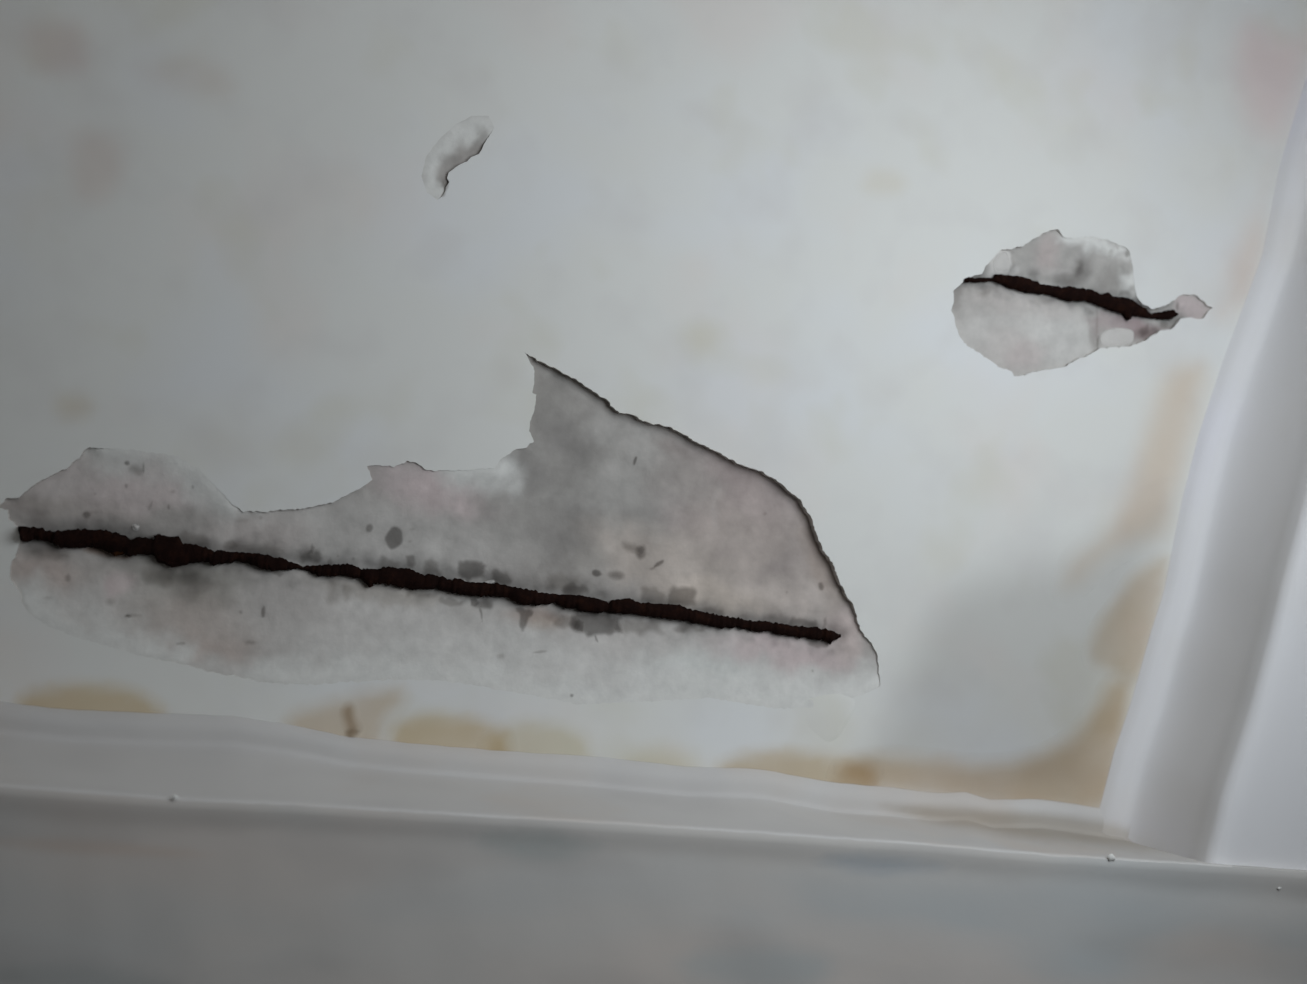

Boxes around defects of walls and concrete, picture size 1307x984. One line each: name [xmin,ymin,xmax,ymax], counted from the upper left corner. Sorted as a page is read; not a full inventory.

peeling [422,116,494,200]
spalling [951,229,1213,376]
spalling [0,354,880,709]